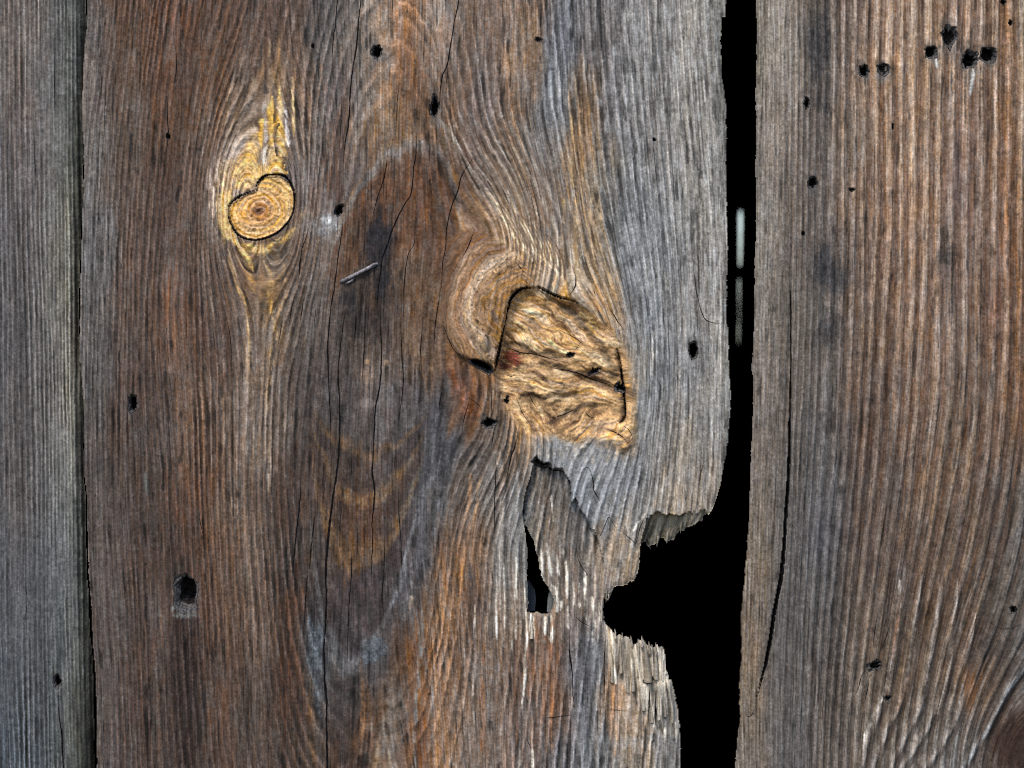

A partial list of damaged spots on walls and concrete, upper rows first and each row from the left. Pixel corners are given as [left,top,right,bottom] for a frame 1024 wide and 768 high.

crack [228,90,473,768]
crack [462,261,645,577]
crack [748,285,792,717]